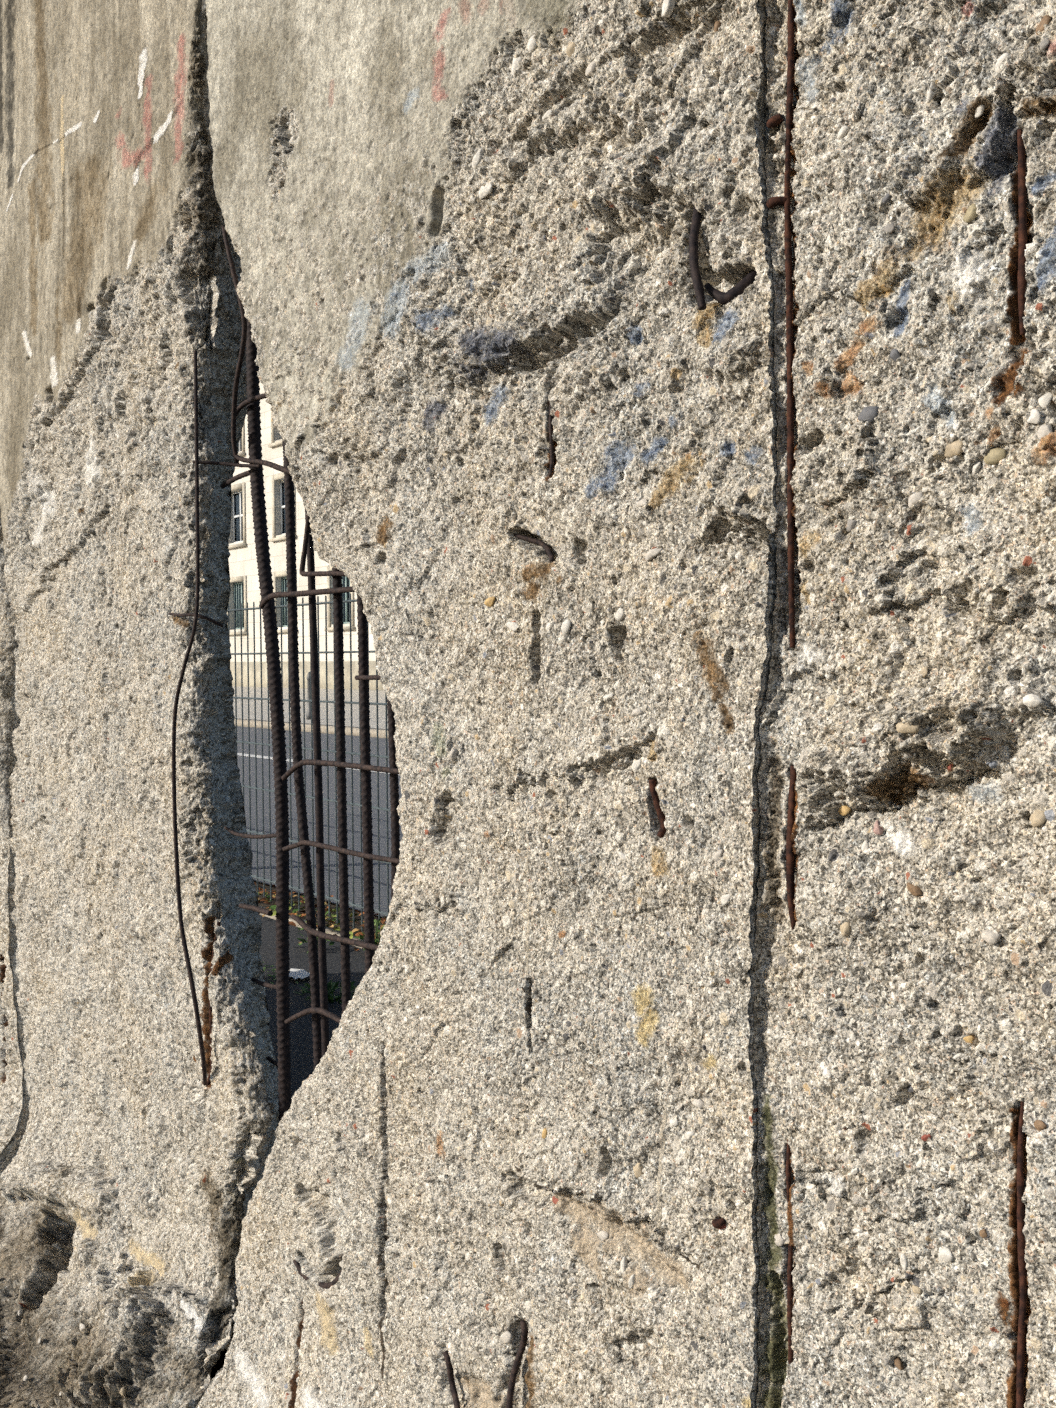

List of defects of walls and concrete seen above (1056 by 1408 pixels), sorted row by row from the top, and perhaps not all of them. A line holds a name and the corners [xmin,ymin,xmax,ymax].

corrosion [985,170,1033,446]
corrosion [1034,432,1056,464]
spalling [0,0,788,1408]
spalling [753,0,1056,1408]
corrosion [193,916,234,1088]
corrosion [787,1151,797,1345]
corrosion [995,1107,1031,1408]